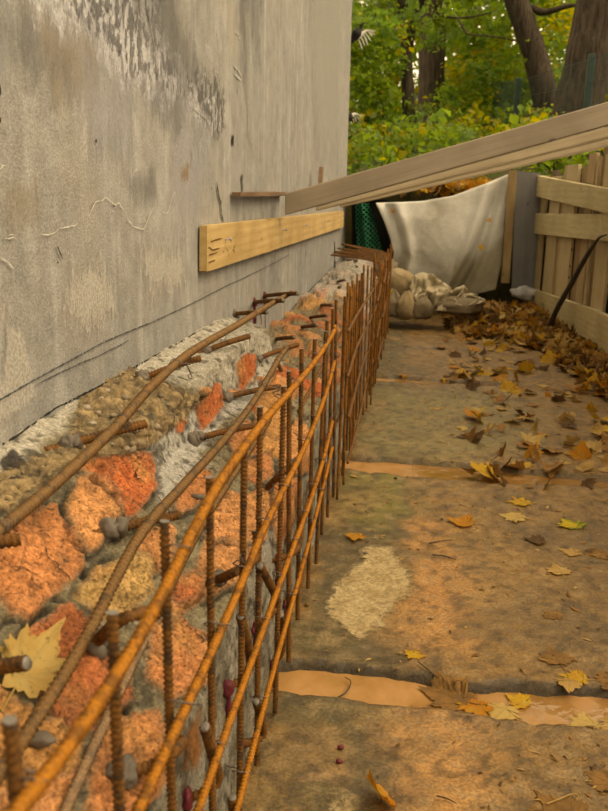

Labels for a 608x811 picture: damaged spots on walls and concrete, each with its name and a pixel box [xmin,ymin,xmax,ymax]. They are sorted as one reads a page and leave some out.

water stain [22,0,225,147]
crack [42,193,176,259]
crack [2,316,231,445]
spalling [0,291,293,535]
spalling [20,346,288,756]
spalling [326,546,414,640]
spalling [58,704,111,811]
spalling [329,788,363,811]